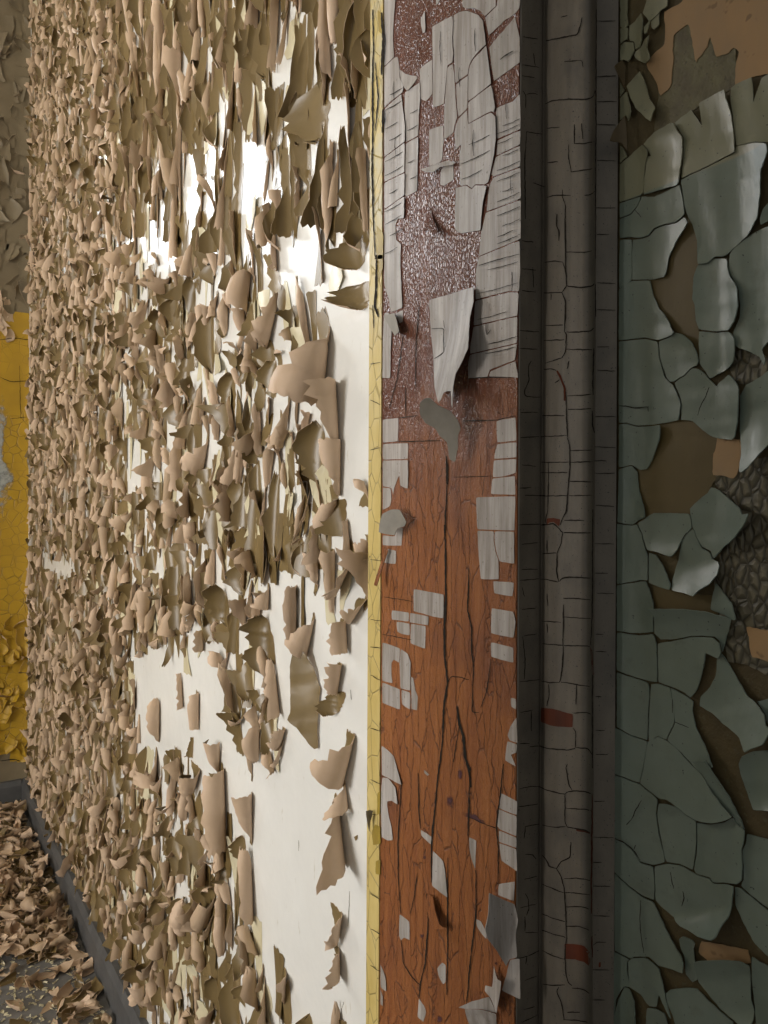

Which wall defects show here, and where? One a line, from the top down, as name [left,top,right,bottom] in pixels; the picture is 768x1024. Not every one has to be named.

peeling [0,0,521,1024]
crack [348,10,649,1023]
peeling [614,0,768,1024]